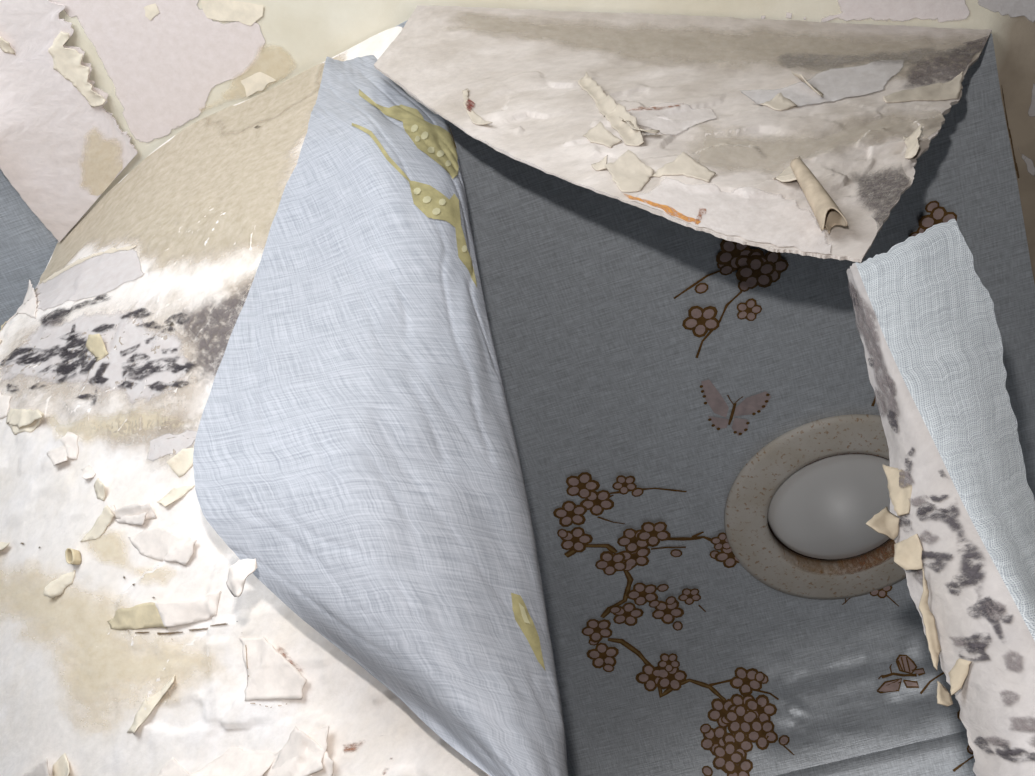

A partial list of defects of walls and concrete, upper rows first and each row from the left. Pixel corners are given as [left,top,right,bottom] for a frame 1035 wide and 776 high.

peeling [48,0,265,142]
peeling [741,59,963,111]
peeling [578,72,831,254]
peeling [0,245,188,435]
leakage [0,280,252,453]
mould [849,283,898,431]
peeling [46,430,197,565]
mould [899,448,914,487]
peeling [866,464,972,707]
mould [897,495,983,594]
mould [952,597,1013,661]
mould [974,718,1035,761]